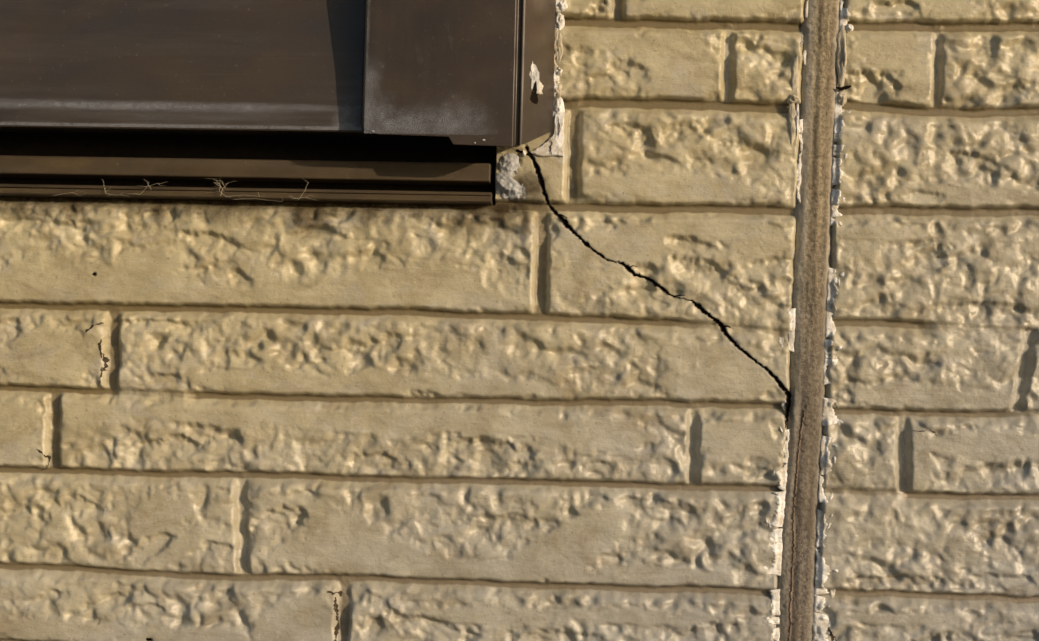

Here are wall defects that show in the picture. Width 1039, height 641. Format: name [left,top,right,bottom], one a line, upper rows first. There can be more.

crack [85,322,110,383]
crack [516,118,837,641]
crack [327,591,343,641]